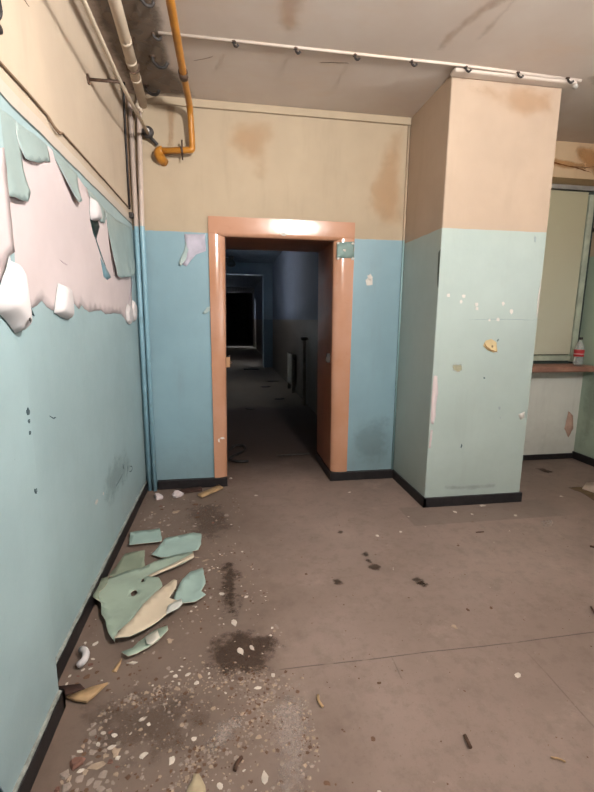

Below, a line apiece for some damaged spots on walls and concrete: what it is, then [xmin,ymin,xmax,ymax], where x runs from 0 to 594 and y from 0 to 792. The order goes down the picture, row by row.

crack [554,162,594,172]
peeling [0,109,137,333]
peeling [179,234,206,266]
spalling [483,339,499,353]
spalling [429,376,438,448]
peeling [564,411,573,437]